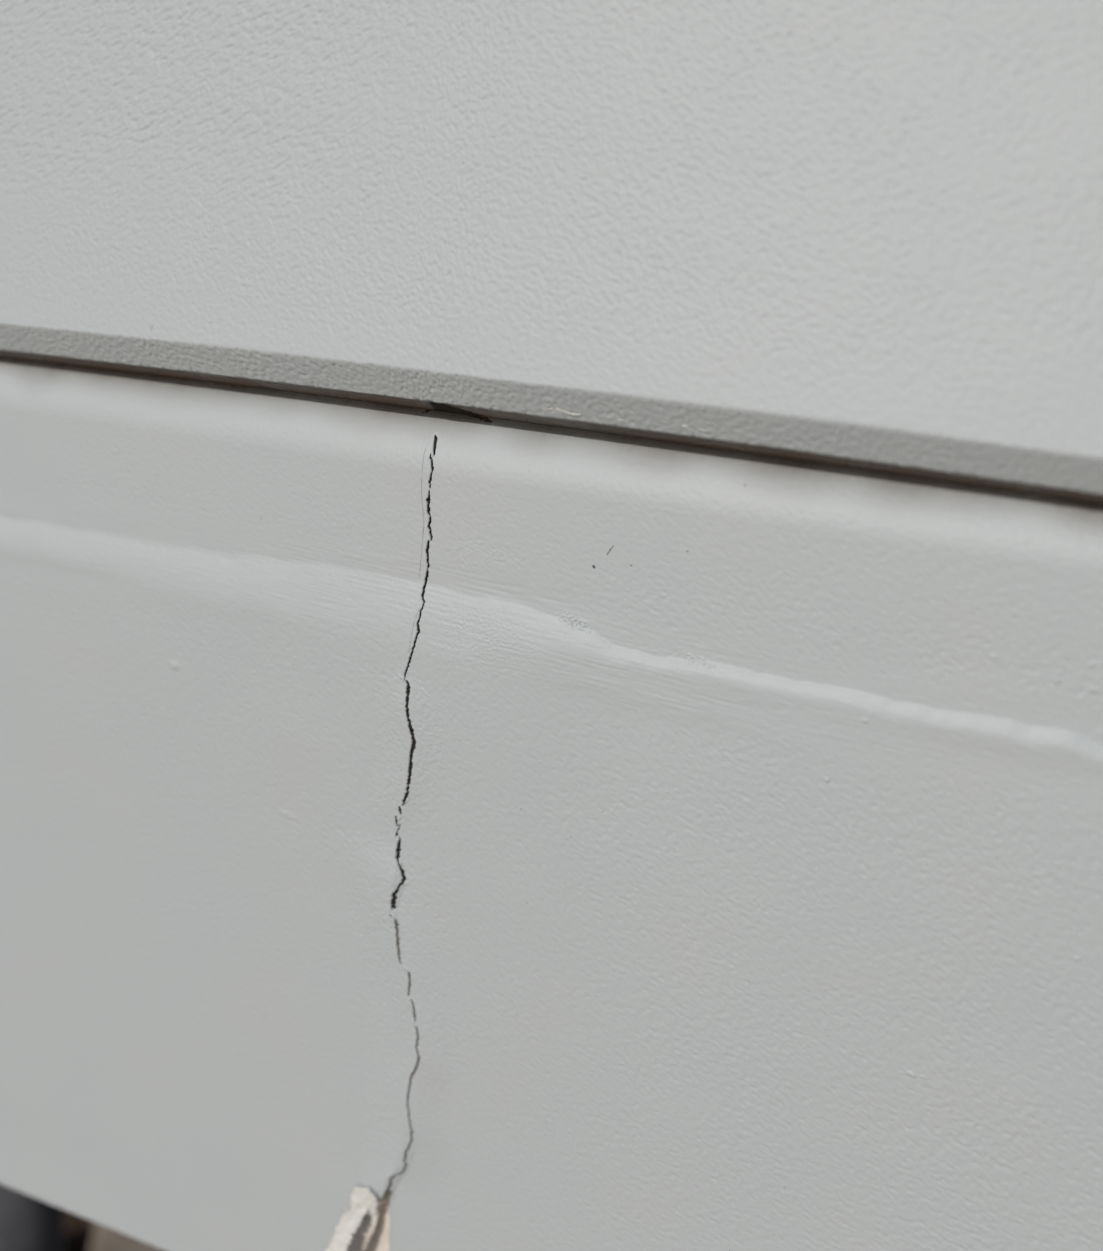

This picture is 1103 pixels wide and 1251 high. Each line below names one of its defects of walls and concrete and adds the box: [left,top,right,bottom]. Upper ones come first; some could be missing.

crack [384,435,437,1201]
peeling [325,1186,392,1251]